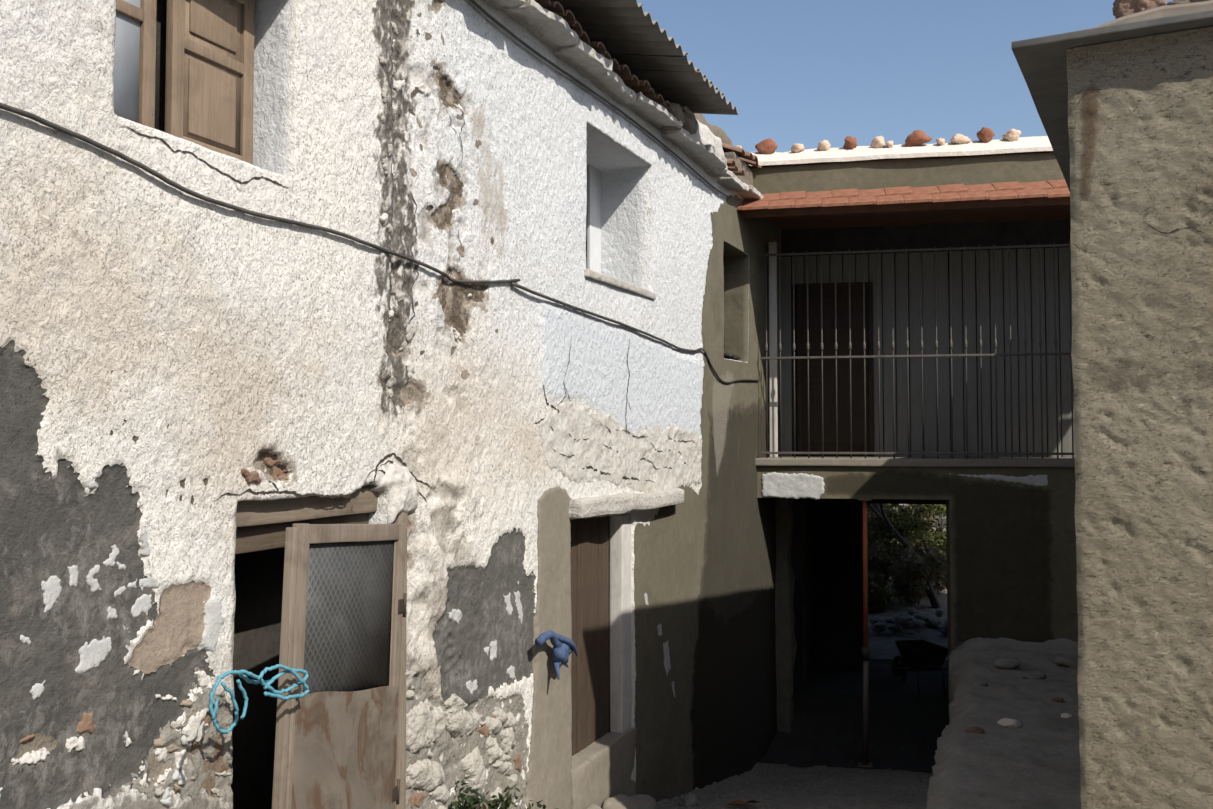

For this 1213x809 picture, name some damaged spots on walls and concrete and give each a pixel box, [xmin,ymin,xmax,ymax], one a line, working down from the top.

crack [121,126,289,193]
flaking render [426,159,489,356]
flaking render [377,311,430,408]
flaking render [241,445,297,485]
crack [214,453,430,514]
crack [533,340,695,482]
flaking render [539,399,703,493]
flaking render [0,340,233,809]
flaking render [405,528,536,809]